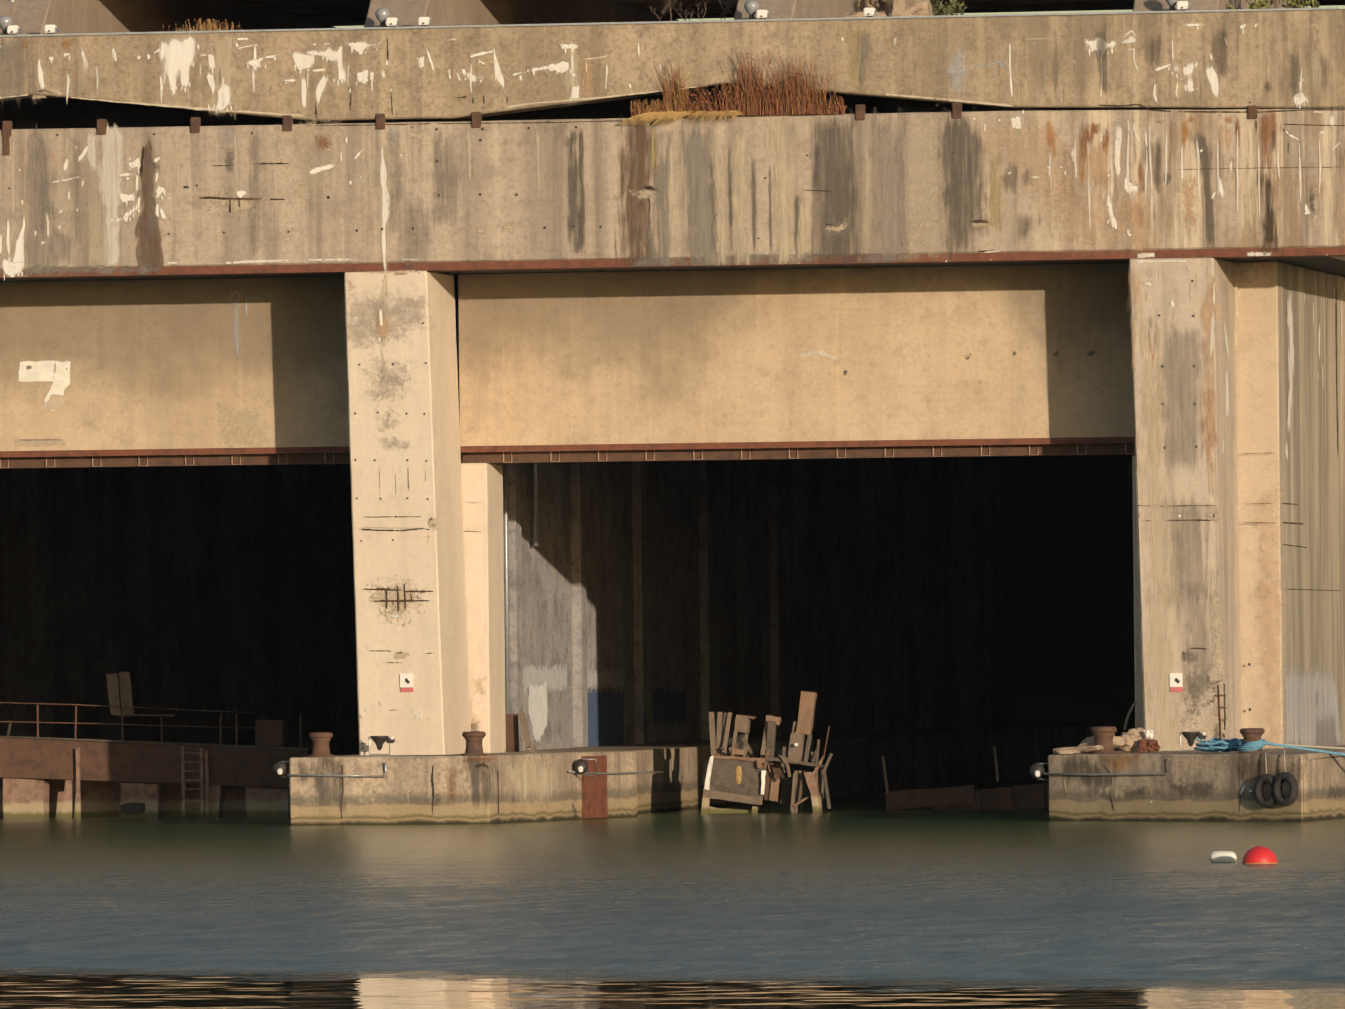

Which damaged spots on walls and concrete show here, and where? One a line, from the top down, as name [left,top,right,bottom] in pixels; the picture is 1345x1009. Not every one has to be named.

damp [1073,30,1138,96]
damp [0,128,177,280]
damp [621,118,905,267]
damp [886,37,1058,262]
rust [1081,124,1109,180]
damp [1032,120,1238,244]
damp [1137,253,1208,299]
damp [1224,147,1280,416]
damp [1286,54,1340,225]
damp [1286,282,1345,459]
spalling [364,582,433,627]